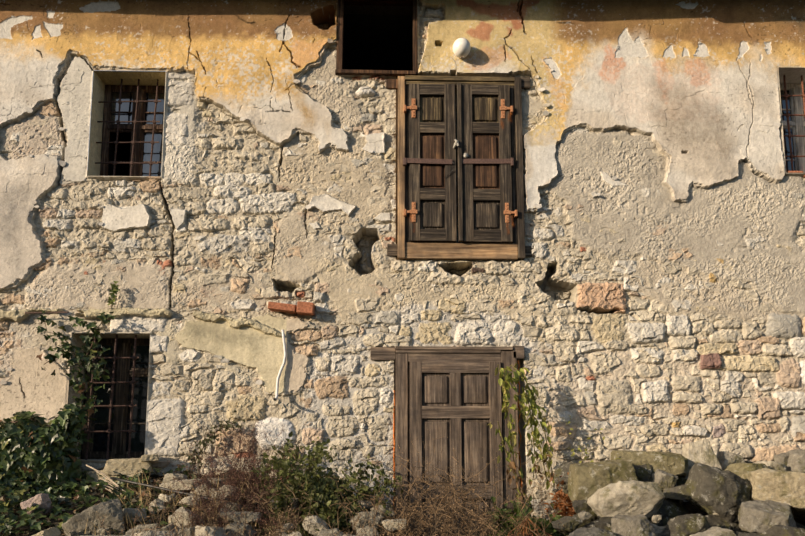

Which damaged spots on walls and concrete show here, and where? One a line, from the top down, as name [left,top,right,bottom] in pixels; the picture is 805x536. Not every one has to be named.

peeling [0,11,63,40]
peeling [79,0,121,13]
crack [504,0,539,83]
spalling [0,100,67,167]
spalling [26,8,398,312]
spalling [521,75,551,136]
crack [737,59,773,183]
spalling [528,97,805,316]
crack [161,186,175,310]
spalling [441,264,473,277]
spalling [175,343,265,418]